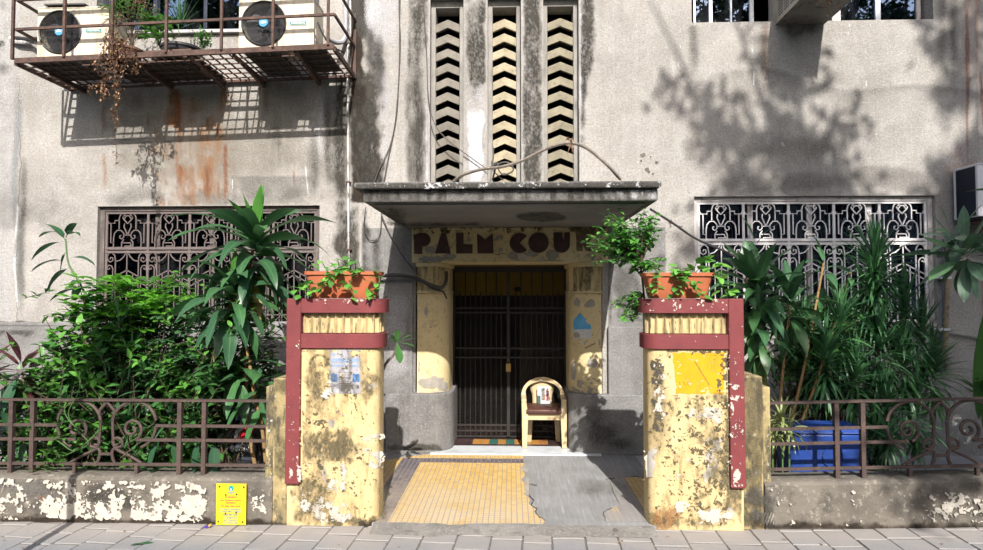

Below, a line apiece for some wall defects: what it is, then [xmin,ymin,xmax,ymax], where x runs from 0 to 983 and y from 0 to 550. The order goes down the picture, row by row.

rust [179,117,227,198]
damp [318,0,660,270]
damp [282,163,316,199]
peeling [653,362,666,419]
peeling [289,422,352,524]
peeling [362,433,385,469]
peeling [643,447,660,477]
peeling [675,352,792,526]
peeling [0,478,207,523]
peeling [250,494,267,514]
peeling [923,492,983,523]